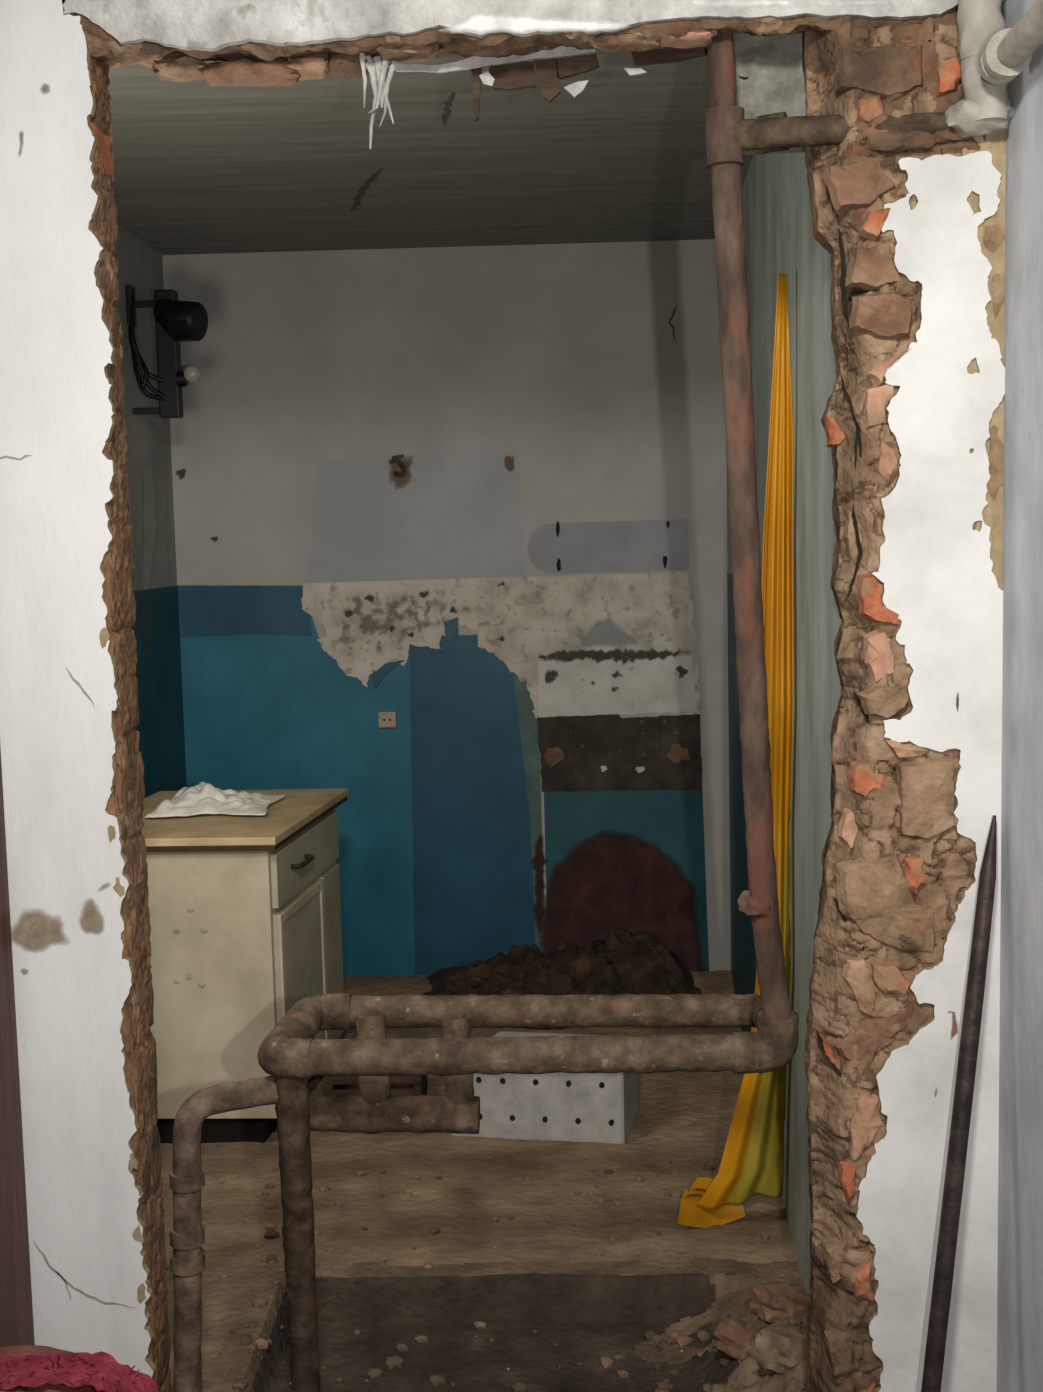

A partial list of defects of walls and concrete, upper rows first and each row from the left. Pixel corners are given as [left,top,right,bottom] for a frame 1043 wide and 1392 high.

crack [33,1240,134,1308]
flaking render [76,13,836,1392]
flaking render [712,5,1006,1392]